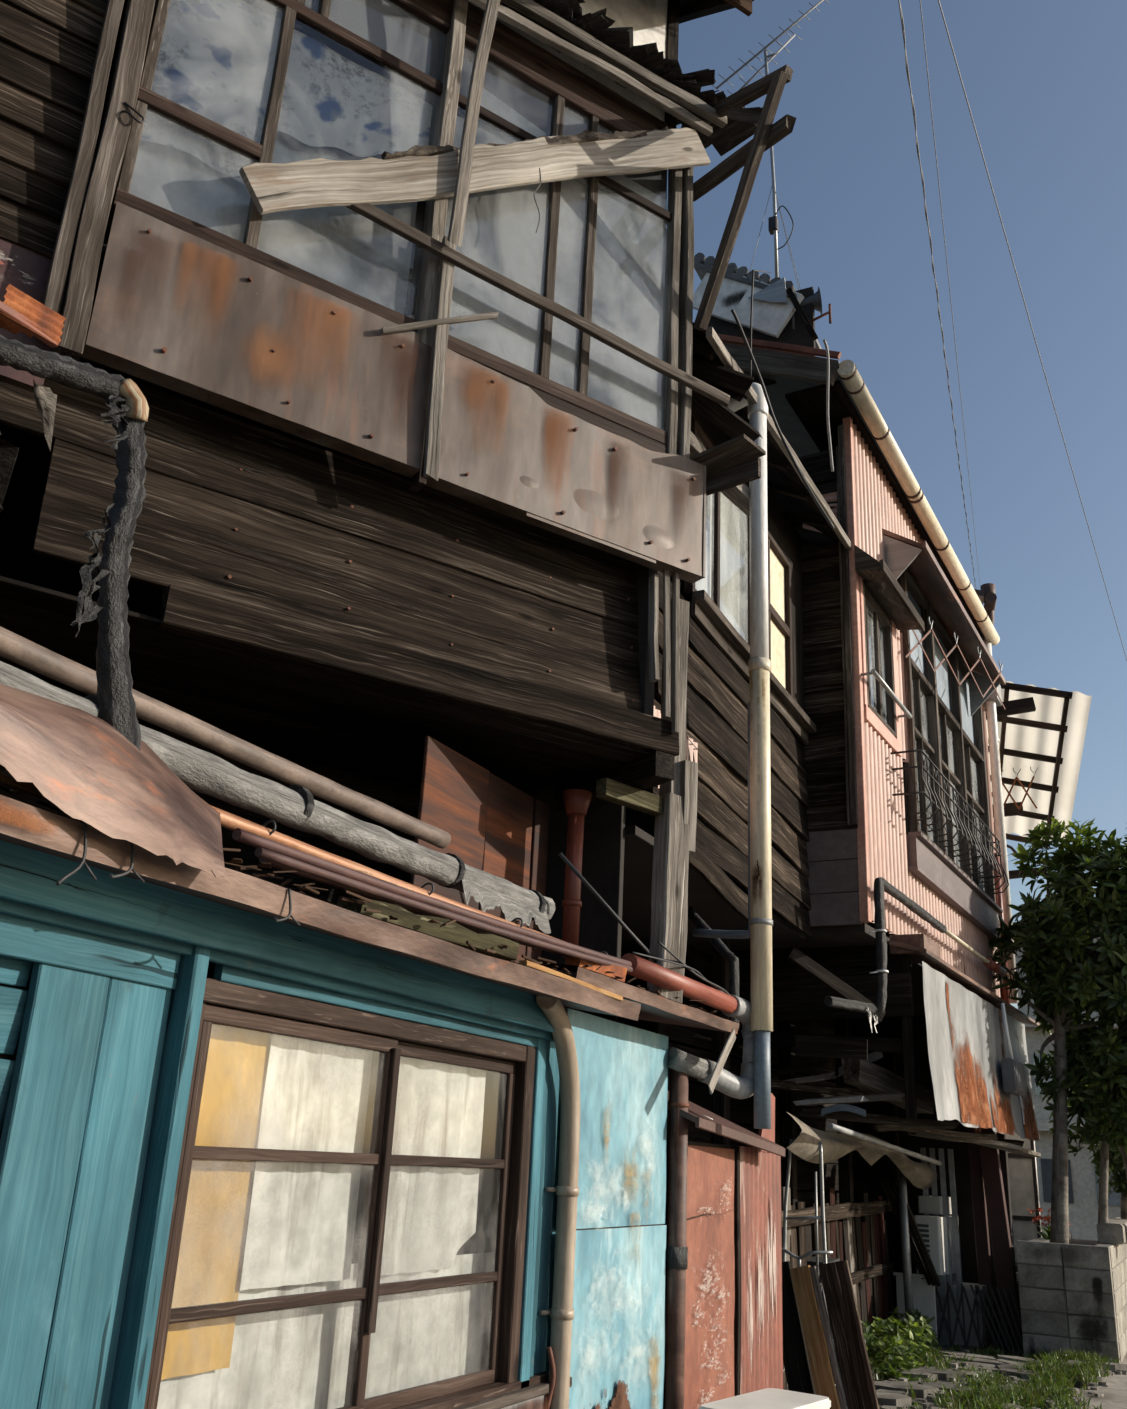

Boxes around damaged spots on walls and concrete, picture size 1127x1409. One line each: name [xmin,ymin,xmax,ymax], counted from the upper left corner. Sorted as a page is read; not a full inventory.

peeling [590,1380,631,1409]